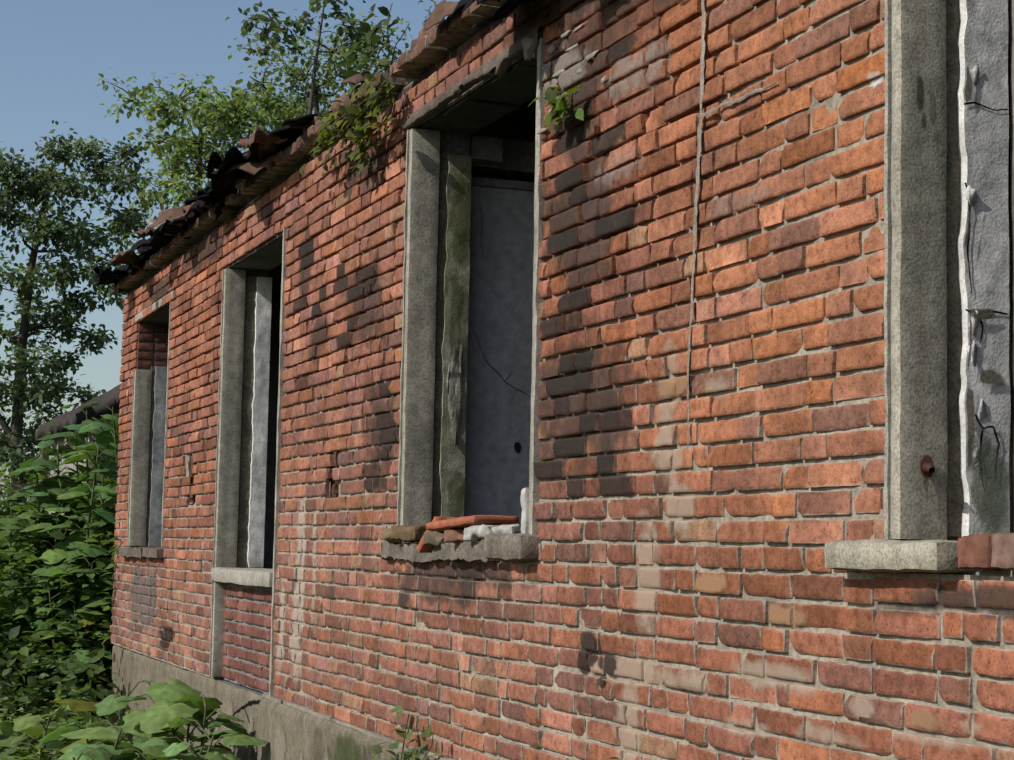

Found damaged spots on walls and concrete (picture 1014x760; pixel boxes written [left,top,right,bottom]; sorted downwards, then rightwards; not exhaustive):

crack [963,102,1008,111]
crack [687,0,777,454]
crack [965,182,1007,343]
crack [975,414,1000,455]
corrosion [920,455,933,486]